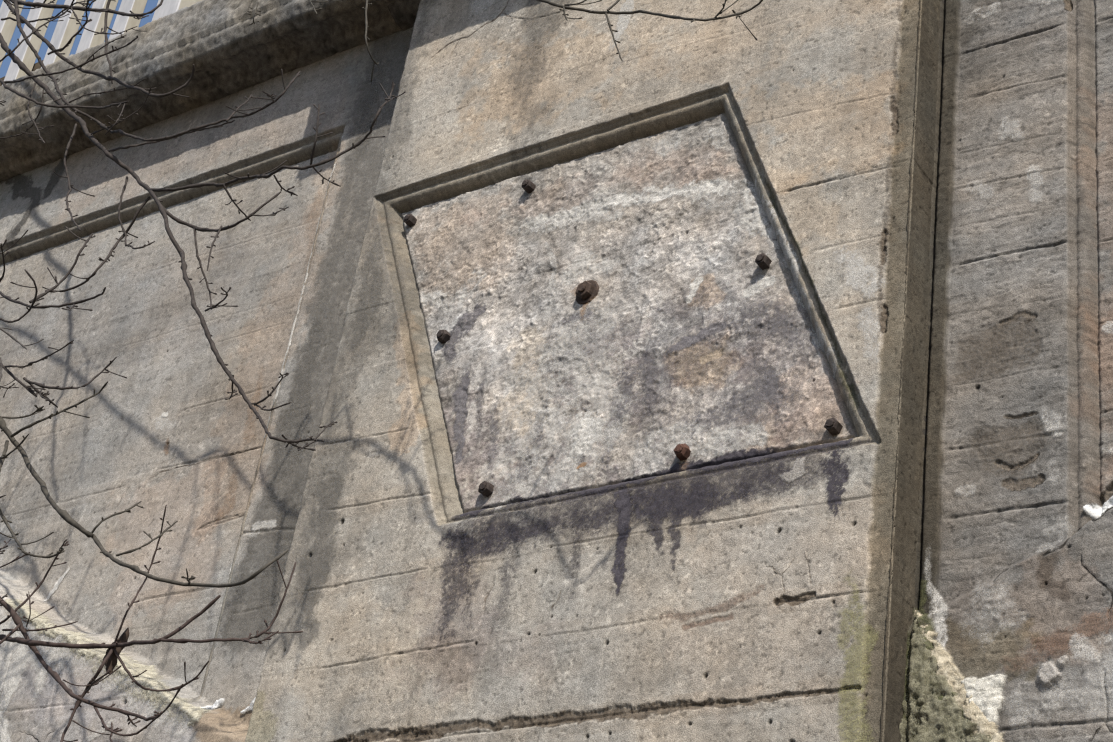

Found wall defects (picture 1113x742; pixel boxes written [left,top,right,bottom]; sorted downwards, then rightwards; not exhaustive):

water stain [221,15,425,648]
water stain [420,270,486,361]
water stain [838,248,882,357]
water stain [439,178,869,639]
spalling [1090,482,1113,520]
crack [1043,507,1113,619]
crack [1092,669,1113,739]